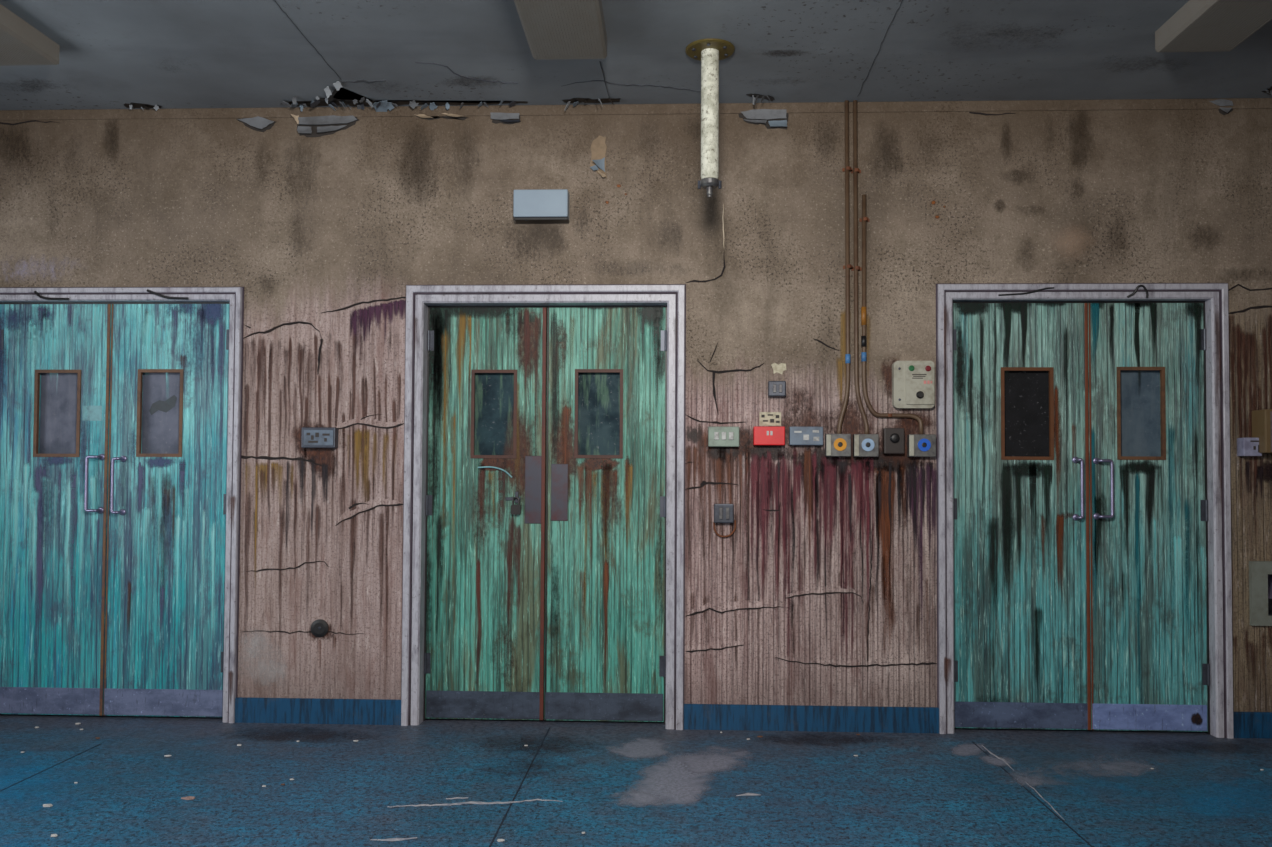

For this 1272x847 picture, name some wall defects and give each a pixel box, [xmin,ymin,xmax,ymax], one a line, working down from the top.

peeling [237,116,276,132]
peeling [281,81,528,137]
leakage [1228,316,1272,441]
crack [336,411,404,429]
crack [241,455,326,467]
crack [335,492,403,525]
rust [474,308,541,686]
rust [552,402,629,557]
rust [686,311,930,641]
leakage [1240,456,1272,517]
crack [246,561,328,572]
crack [243,628,363,636]